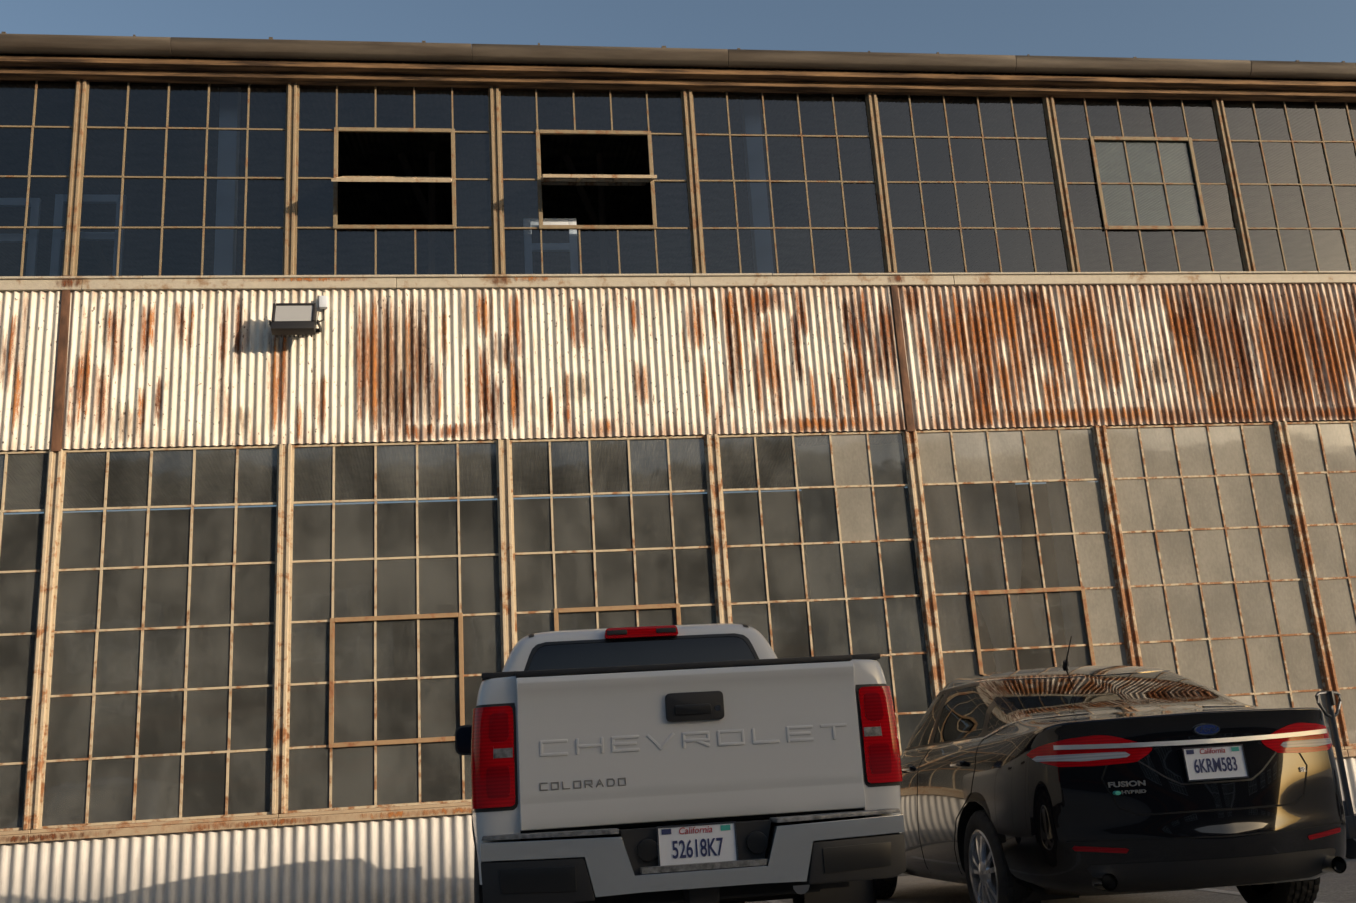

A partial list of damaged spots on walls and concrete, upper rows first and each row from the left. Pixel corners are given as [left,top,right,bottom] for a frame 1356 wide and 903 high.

rust [2,311,26,433]
rust [220,299,243,369]
rust [268,335,301,435]
rust [357,277,547,438]
rust [548,374,585,430]
rust [570,302,584,349]
rust [634,370,648,399]
rust [686,289,896,430]
rust [889,275,1163,425]
rust [1164,289,1356,420]